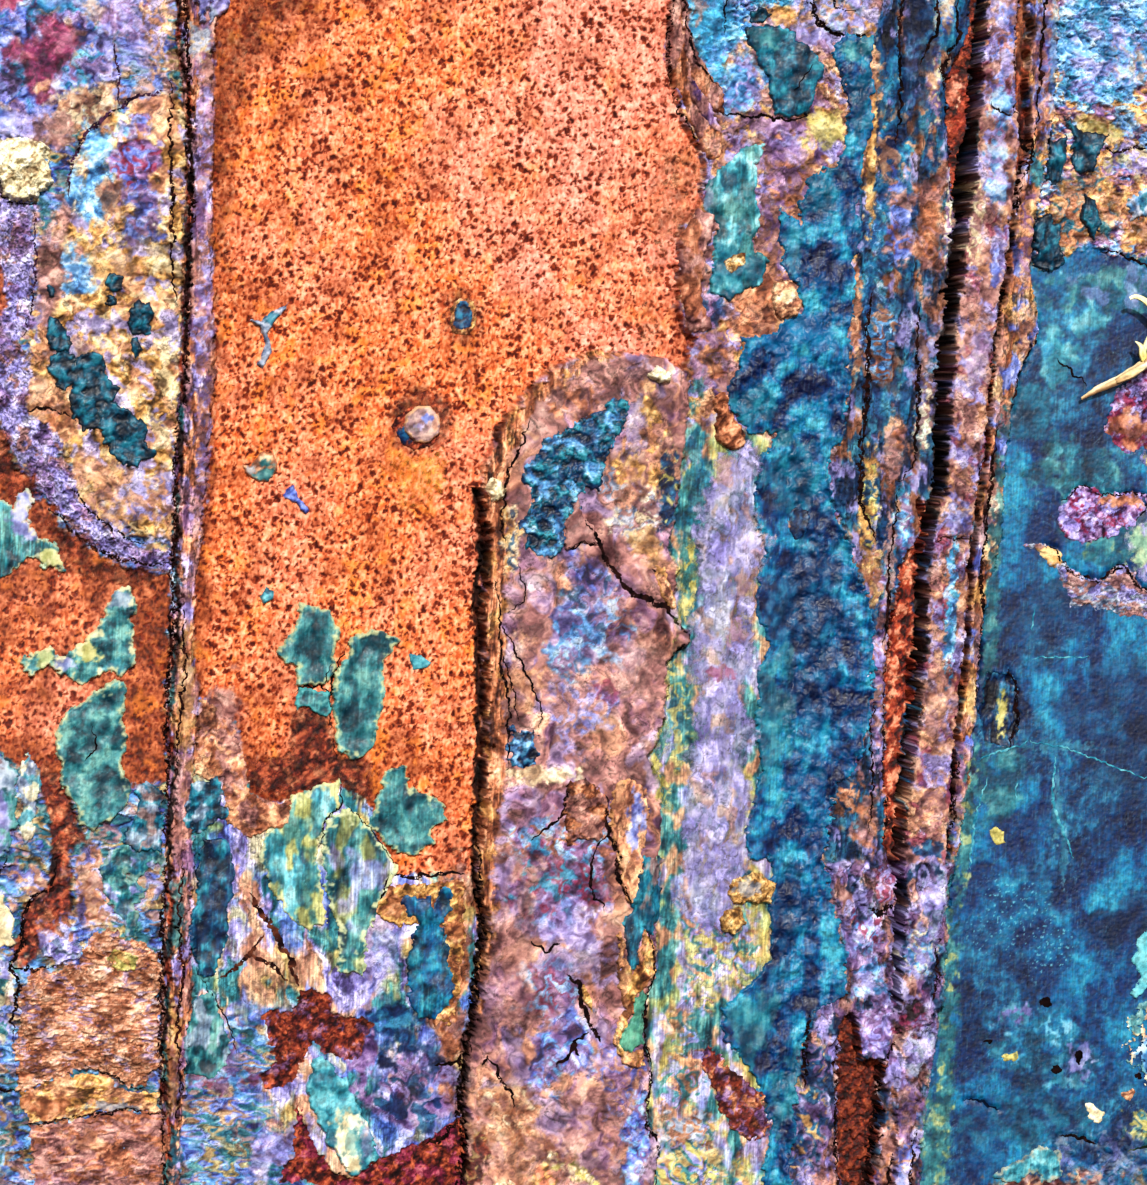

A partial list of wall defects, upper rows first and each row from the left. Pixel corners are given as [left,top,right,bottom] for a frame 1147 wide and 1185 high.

corrosion [665,0,725,160]
peeling [0,488,66,578]
crack [27,0,299,1185]
peeling [276,602,401,760]
peeling [409,654,431,670]
crack [494,420,544,770]
crack [568,520,691,661]
corrosion [192,699,373,838]
corrosion [562,777,650,903]
crack [296,643,515,1185]
corrosion [260,988,375,1089]
corrosion [278,1101,468,1185]